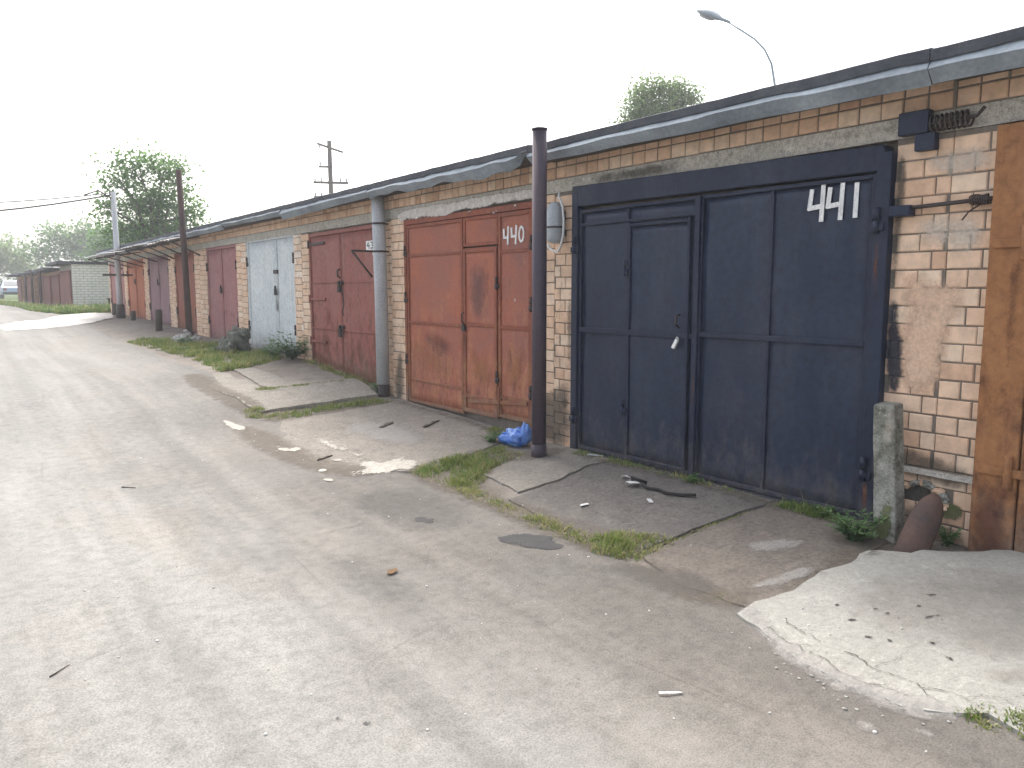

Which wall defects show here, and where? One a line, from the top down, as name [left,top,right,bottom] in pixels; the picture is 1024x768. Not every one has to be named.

spalling [904,480,950,511]
crack [767,618,1024,708]